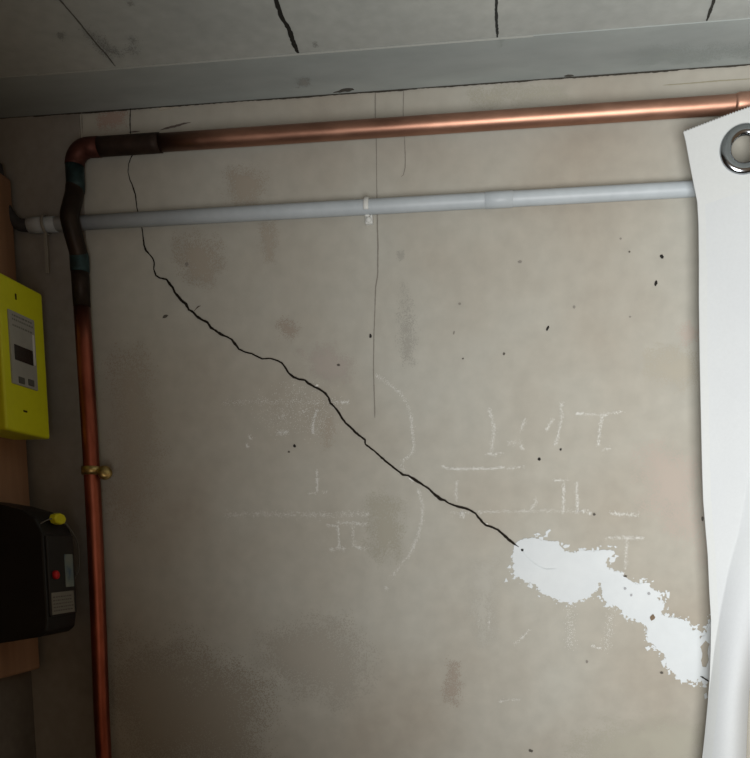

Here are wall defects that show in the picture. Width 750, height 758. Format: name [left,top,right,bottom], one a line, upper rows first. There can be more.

crack [274,0,299,53]
crack [493,0,501,37]
crack [706,0,715,21]
crack [128,138,552,570]